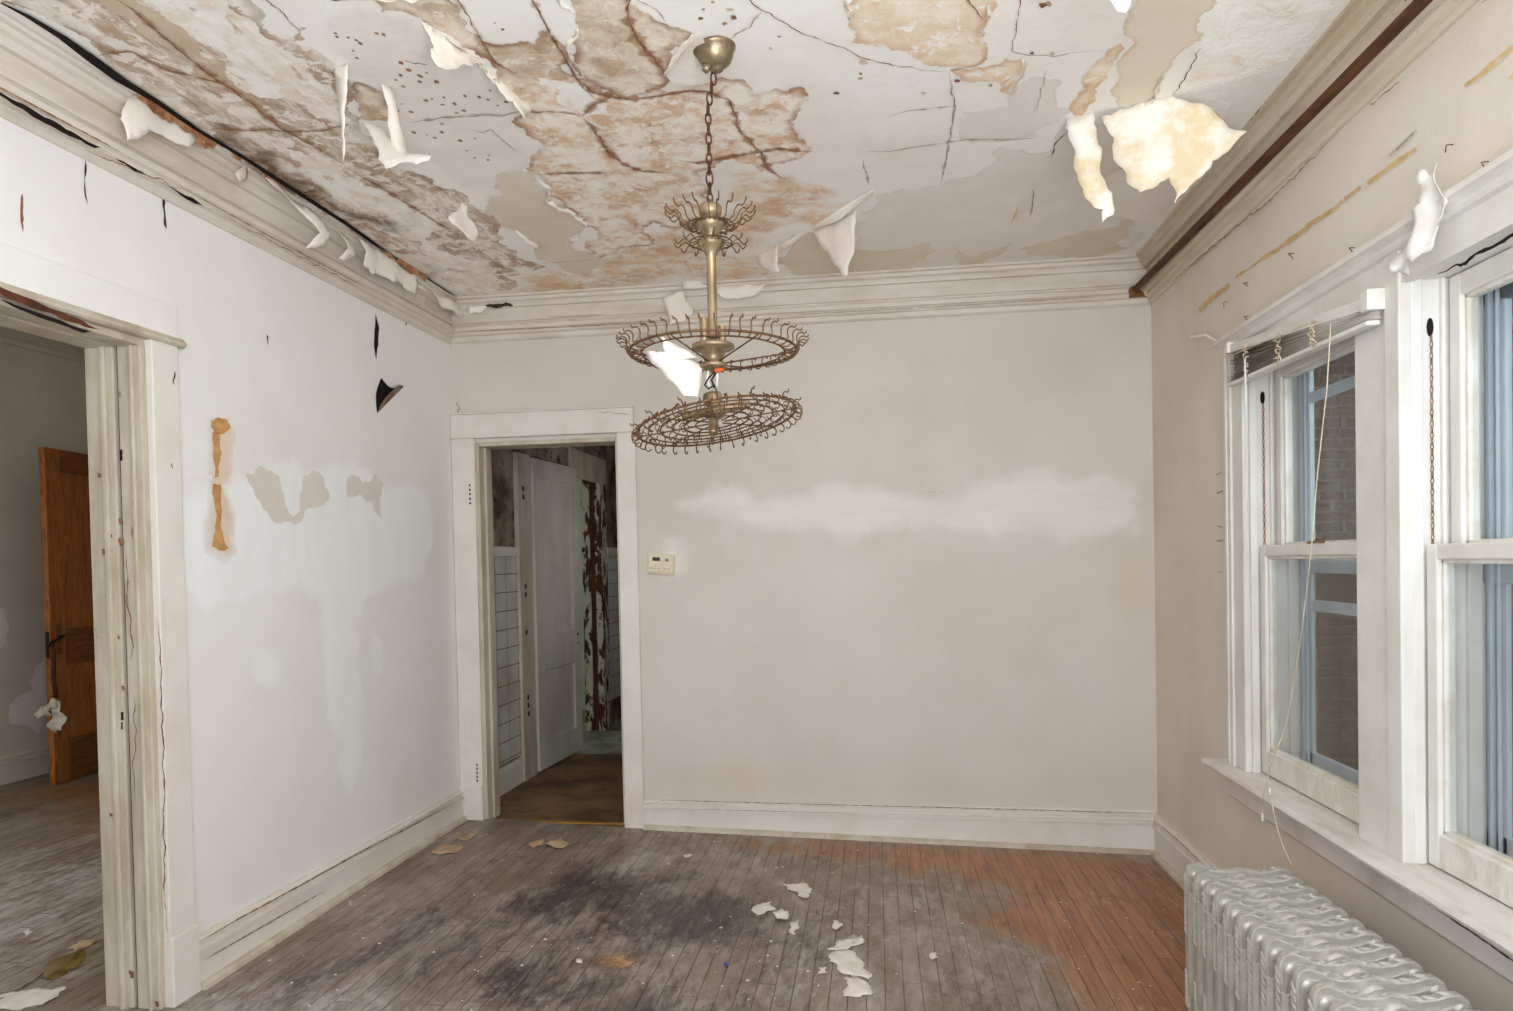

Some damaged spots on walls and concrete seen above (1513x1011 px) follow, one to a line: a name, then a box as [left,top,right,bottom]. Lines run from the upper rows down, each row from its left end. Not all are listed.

crack [18,194,26,230]
crack [84,149,181,229]
crack [99,1,453,233]
crack [228,217,357,287]
peeling [271,143,507,296]
peeling [99,0,737,273]
leakage [2,0,870,294]
crack [415,0,812,182]
crack [729,0,1102,183]
peeling [777,0,1342,275]
peeling [246,466,383,525]